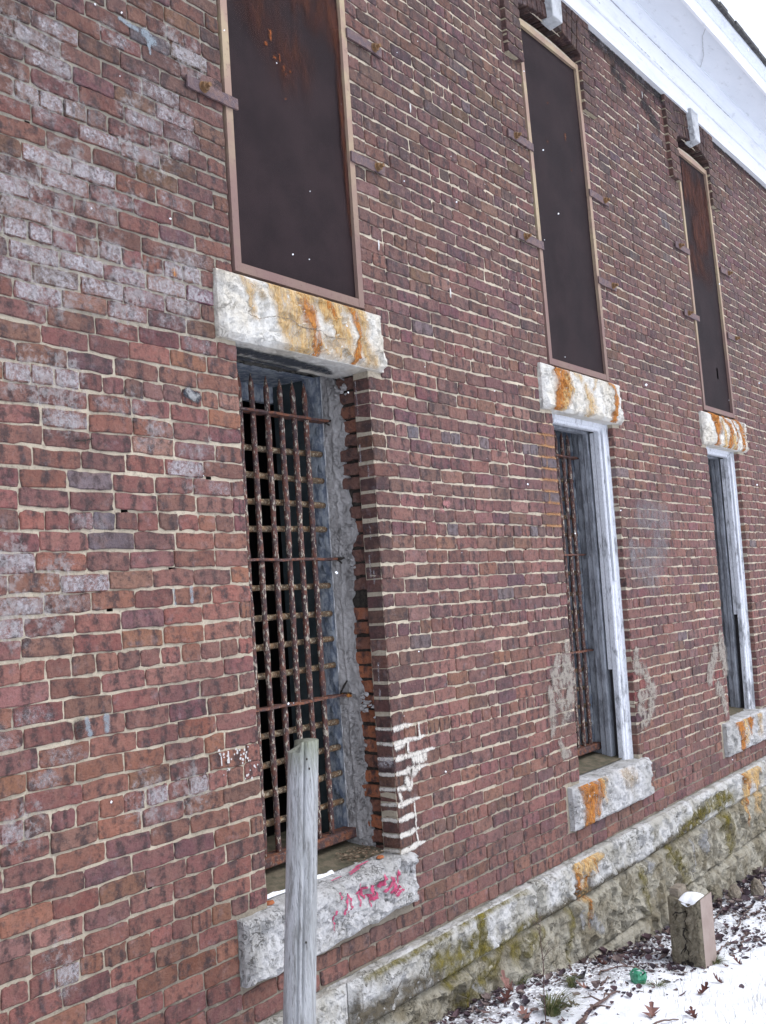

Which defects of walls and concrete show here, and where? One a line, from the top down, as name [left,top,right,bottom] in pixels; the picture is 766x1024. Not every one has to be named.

corrosion [266,282,378,365]
corrosion [554,366,620,423]
corrosion [708,412,746,452]
corrosion [736,713,761,751]
corrosion [580,778,608,827]
corrosion [741,766,762,819]
water stain [651,812,704,878]
corrosion [574,853,604,914]
water stain [365,933,448,980]
water stain [459,862,646,1009]
crack [672,910,692,955]
water stain [349,973,444,1024]